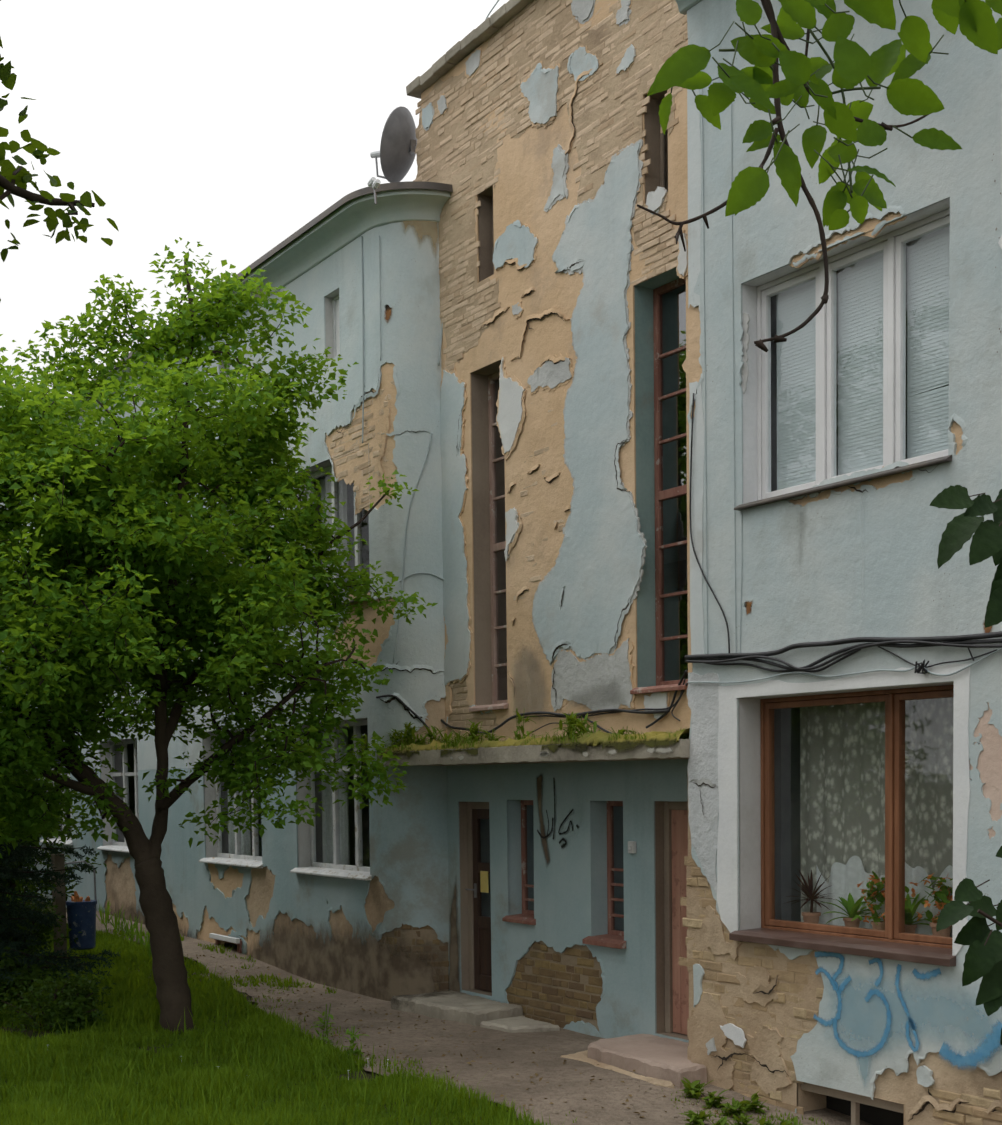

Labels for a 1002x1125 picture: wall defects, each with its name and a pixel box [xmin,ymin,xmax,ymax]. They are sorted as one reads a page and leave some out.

crack [565,63,603,155]
spalling [789,205,907,268]
spalling [398,0,688,744]
spalling [682,304,704,423]
spalling [324,362,400,515]
peeling [969,702,1002,839]
spalling [104,853,137,913]
spalling [172,857,316,955]
spalling [364,876,449,992]
spalling [506,940,606,1031]
spalling [679,852,824,1115]
spalling [870,1050,1002,1125]